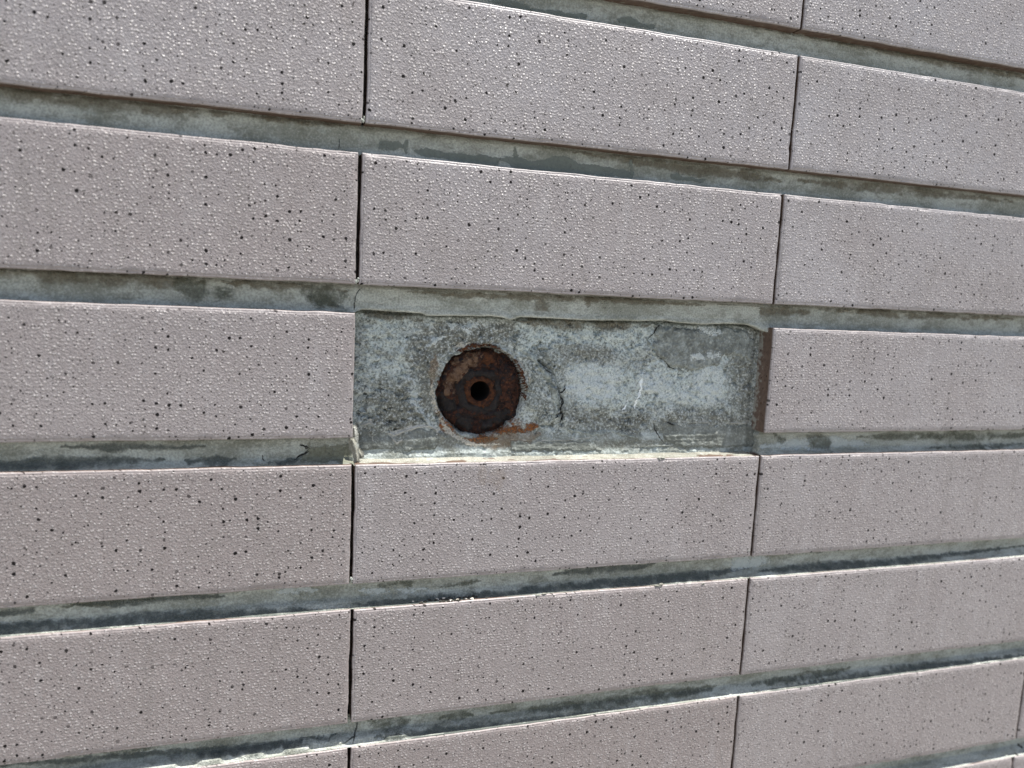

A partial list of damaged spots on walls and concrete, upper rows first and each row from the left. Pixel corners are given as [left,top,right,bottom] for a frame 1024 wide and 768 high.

rust [435,378,539,444]
rust [457,343,528,400]
spalling [352,310,760,461]